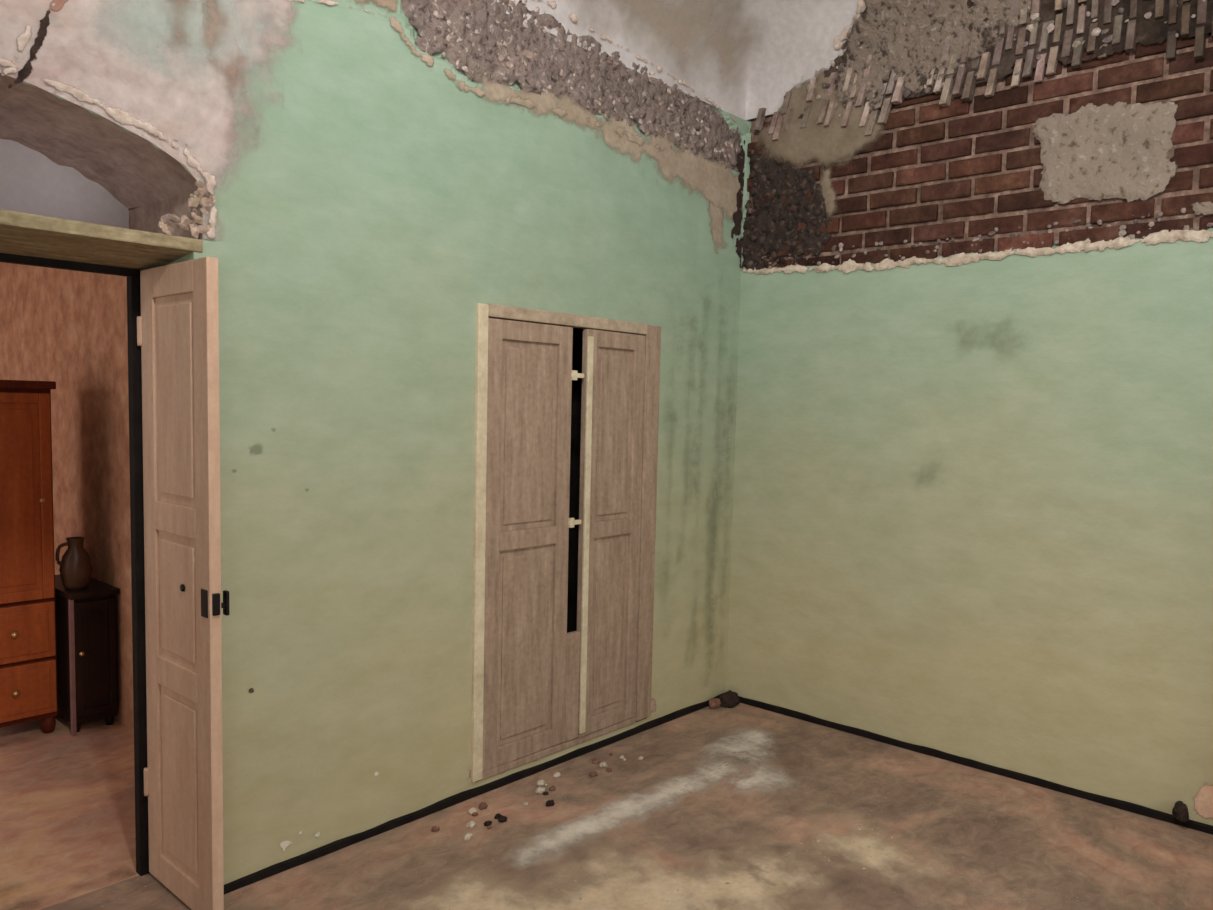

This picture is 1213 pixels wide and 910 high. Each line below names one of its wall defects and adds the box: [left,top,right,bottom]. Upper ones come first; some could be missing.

crack [1,0,67,88]
flaking render [0,0,1213,275]
peeling [1194,783,1213,819]